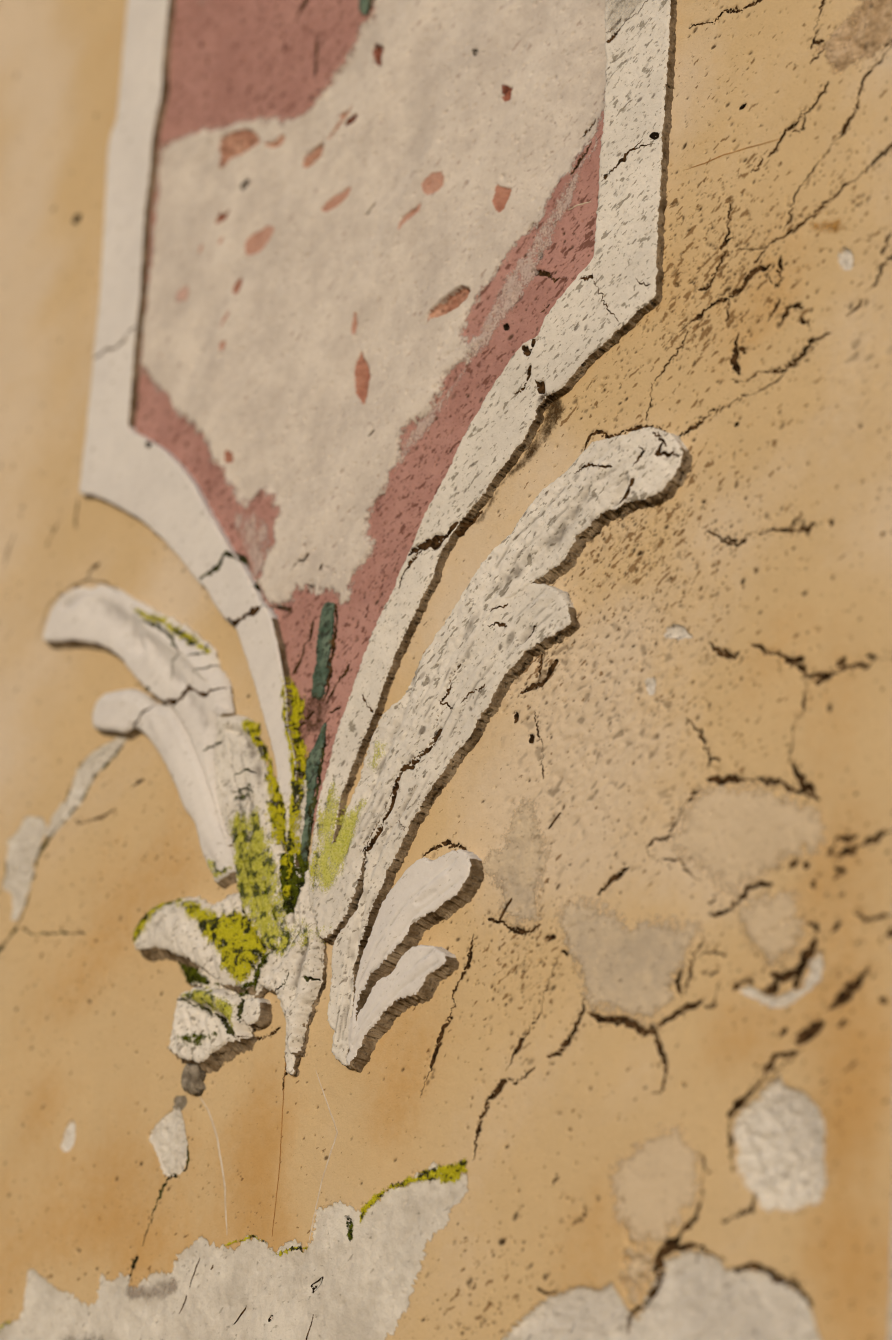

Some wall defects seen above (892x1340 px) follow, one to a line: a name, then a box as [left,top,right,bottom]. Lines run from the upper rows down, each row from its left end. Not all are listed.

spalling [218,129,285,168]
crack [570,0,892,505]
crack [706,513,833,547]
peeling [2,737,126,921]
crack [0,550,323,951]
crack [421,642,892,1159]
crack [177,958,321,1090]
peeling [149,1095,188,1176]
crack [626,967,887,1334]
spalling [733,1073,827,1213]
peeling [0,1161,469,1340]
spalling [501,1250,820,1340]